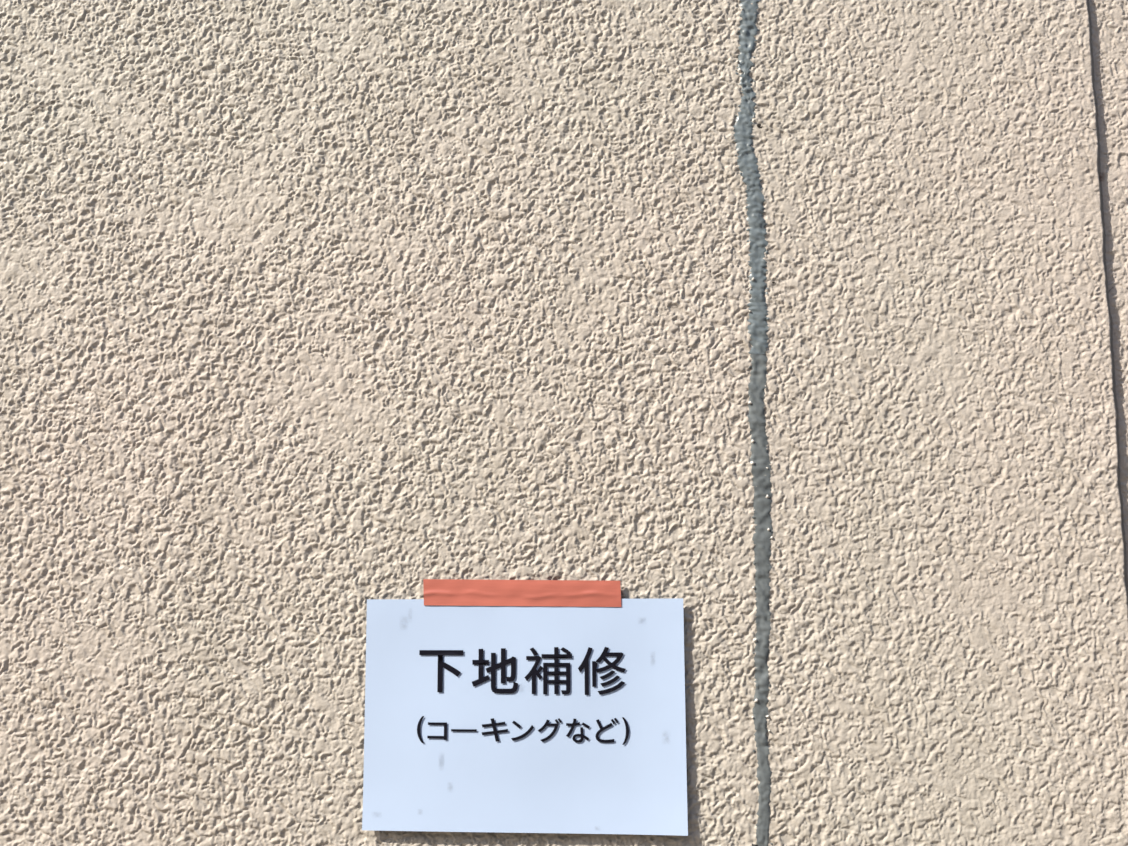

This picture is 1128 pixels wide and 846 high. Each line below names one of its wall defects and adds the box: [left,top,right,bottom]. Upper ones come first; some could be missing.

crack [733,0,774,846]